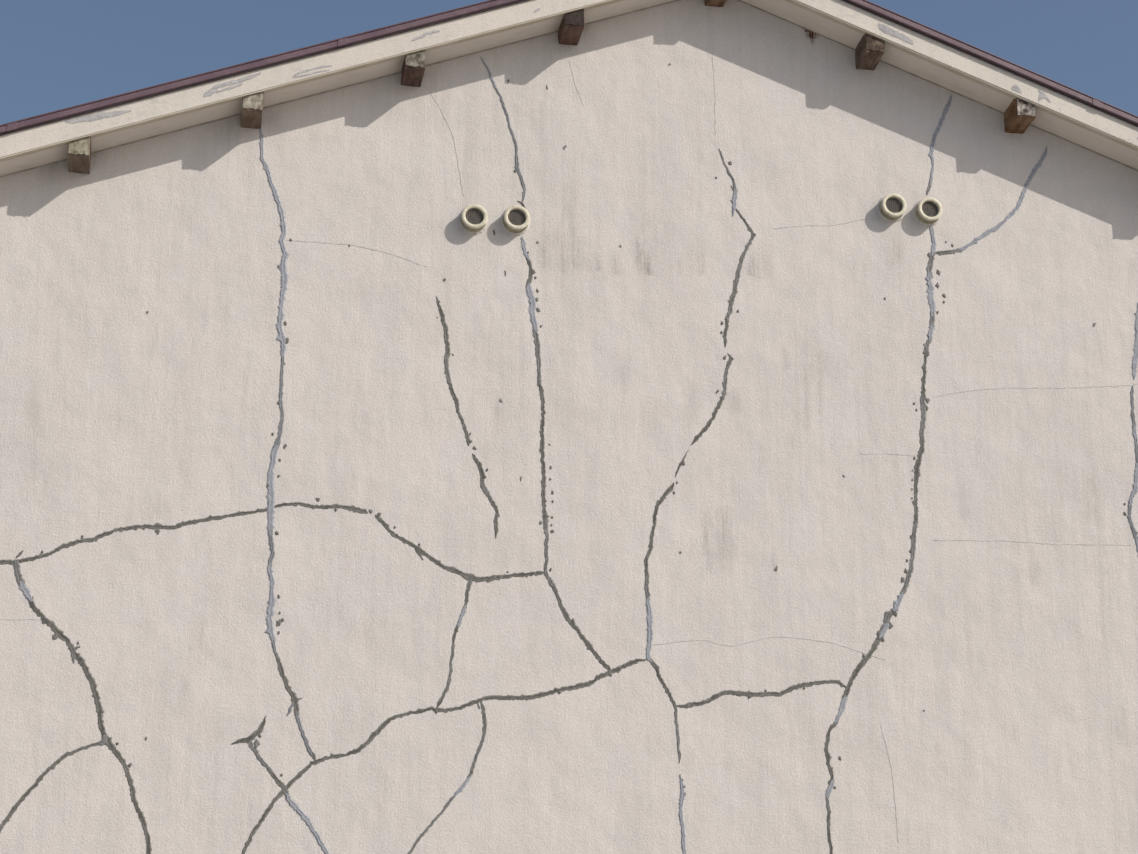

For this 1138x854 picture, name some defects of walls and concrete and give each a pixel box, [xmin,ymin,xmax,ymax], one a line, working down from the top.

crack [425,86,464,196]
crack [481,57,526,209]
crack [926,94,952,195]
crack [0,127,1047,854]
crack [933,303,1138,552]